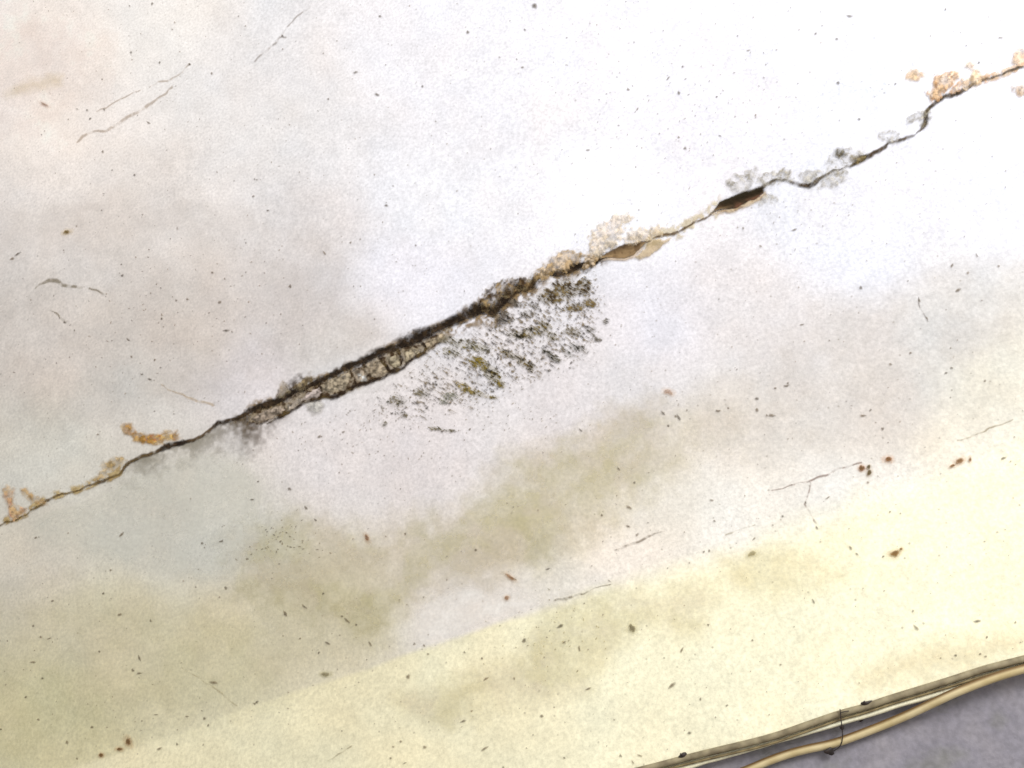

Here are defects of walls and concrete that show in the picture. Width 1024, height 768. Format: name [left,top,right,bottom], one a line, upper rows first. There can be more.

rust [906,61,987,102]
crack [0,65,1024,526]
mould [374,274,608,432]
rust [122,424,178,445]
rust [3,488,45,521]